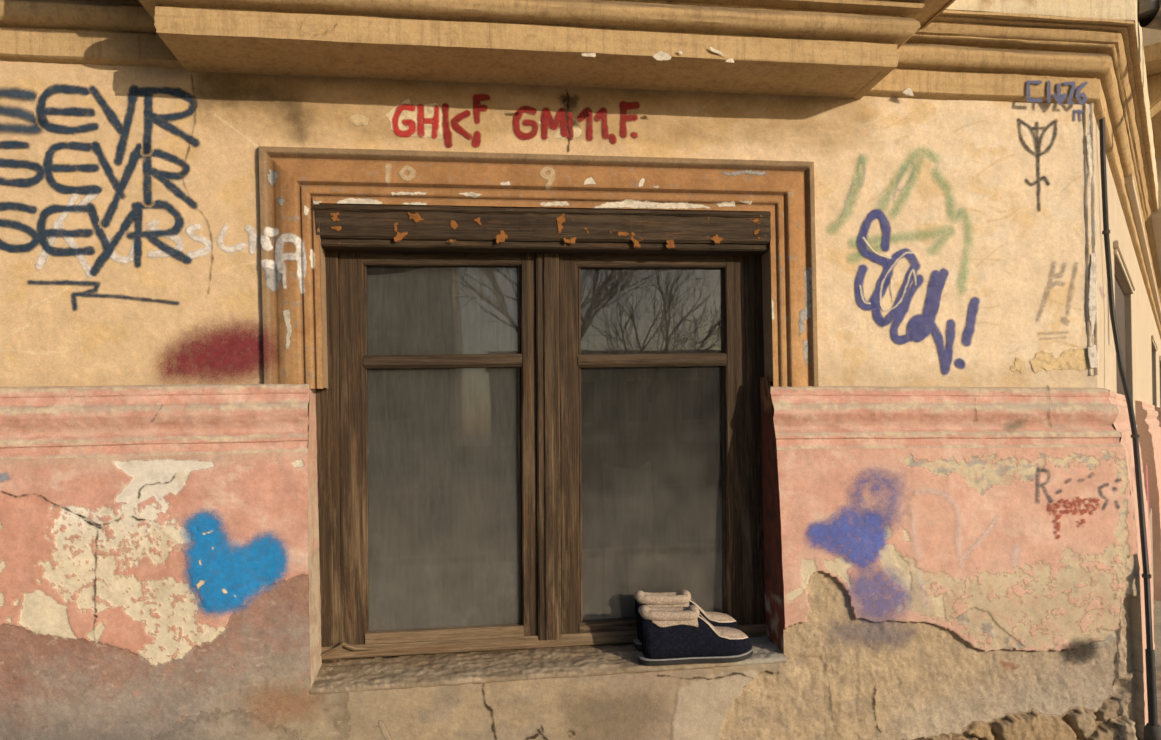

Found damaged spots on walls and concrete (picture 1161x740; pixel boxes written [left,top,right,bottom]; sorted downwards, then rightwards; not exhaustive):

peeling [1010,253,1098,373]
crack [3,477,174,629]
flaking render [0,459,351,740]
flaking render [720,450,1145,740]
crack [482,685,497,739]
crack [527,725,575,740]